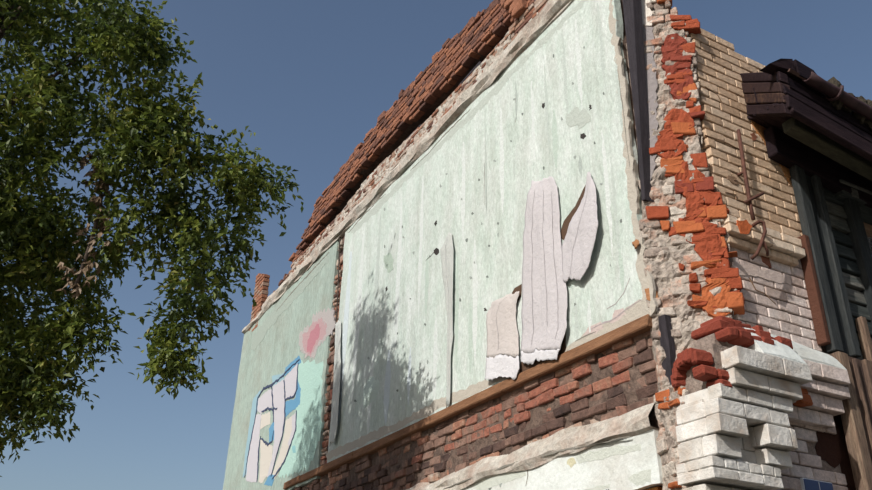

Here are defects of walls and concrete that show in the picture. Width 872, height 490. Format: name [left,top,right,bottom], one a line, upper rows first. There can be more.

spalling [285,0,548,279]
peeling [326,0,752,460]